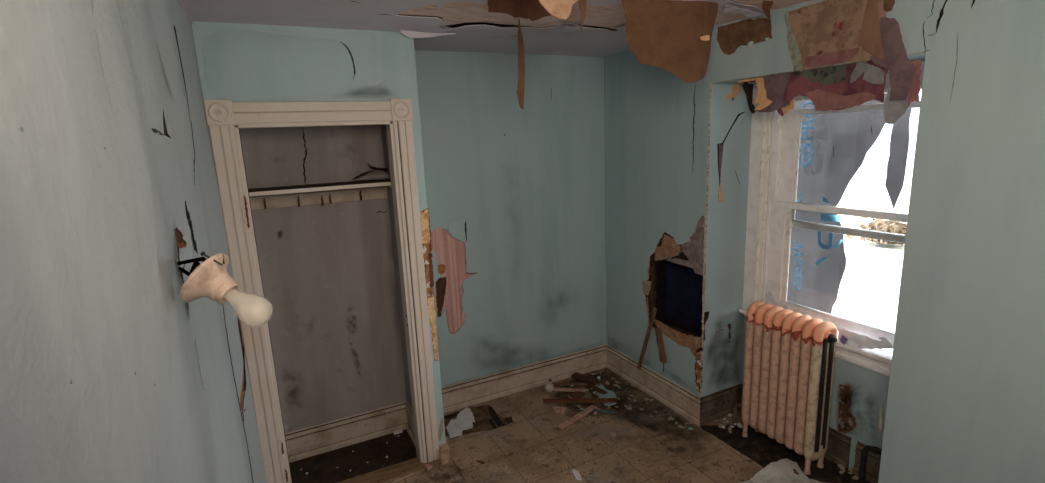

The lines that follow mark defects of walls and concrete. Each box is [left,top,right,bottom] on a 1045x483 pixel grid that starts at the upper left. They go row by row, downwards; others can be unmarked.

crack [923,0,975,102]
crack [185,122,198,254]
crack [301,131,309,184]
flaking render [420,208,476,361]
spalling [642,216,706,392]